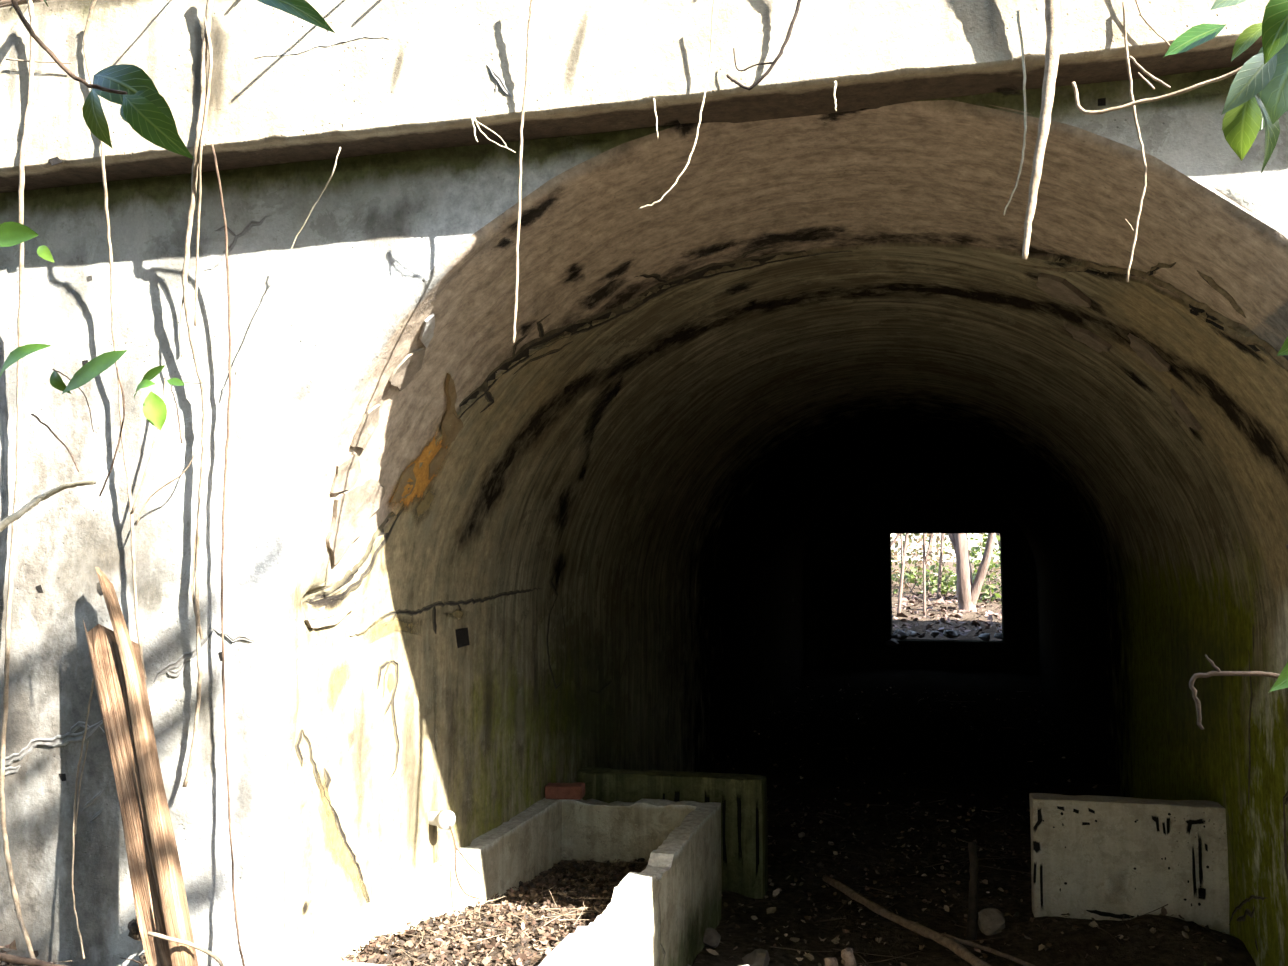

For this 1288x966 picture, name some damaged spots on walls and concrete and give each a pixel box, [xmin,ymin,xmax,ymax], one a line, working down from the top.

crack [204,215,271,270]
flaking render [389,313,435,391]
crack [458,246,852,419]
flaking render [326,404,385,566]
crack [306,507,405,604]
rust [389,373,463,521]
crack [349,587,542,637]
crack [378,660,400,782]
crack [295,729,370,903]
crack [1229,791,1288,951]